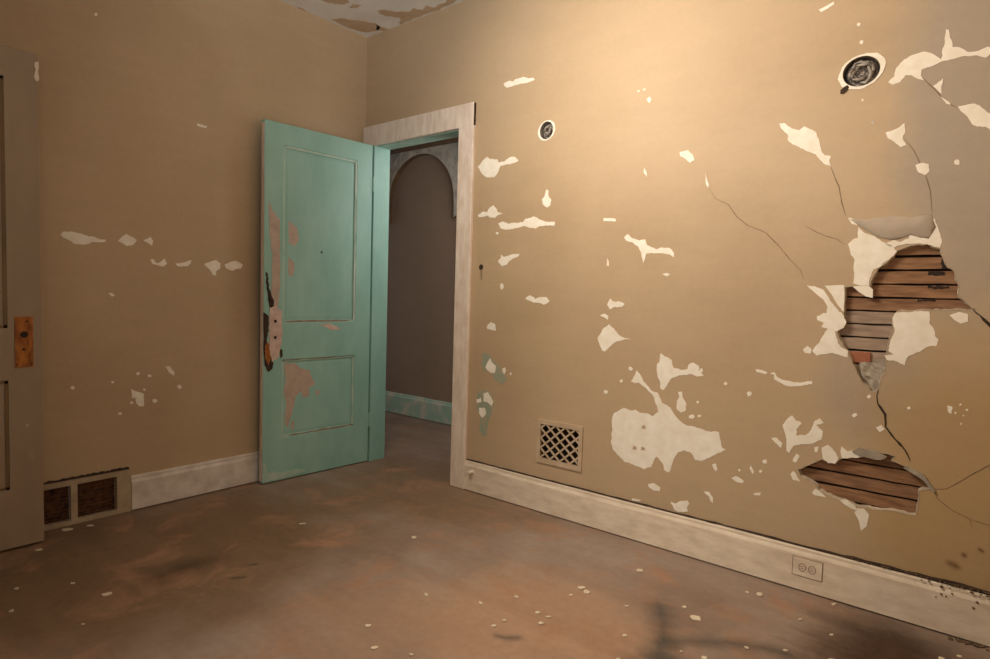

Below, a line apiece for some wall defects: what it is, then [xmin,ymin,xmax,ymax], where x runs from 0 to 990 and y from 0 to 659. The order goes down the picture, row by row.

peeling [889,29,990,85]
peeling [934,79,990,129]
peeling [478,157,519,178]
peeling [779,123,831,166]
peeling [886,123,906,147]
peeling [478,206,555,234]
crack [709,189,804,279]
peeling [598,298,628,352]
spalling [803,218,976,398]
peeling [611,354,725,473]
crack [876,388,910,461]
spalling [771,416,935,530]